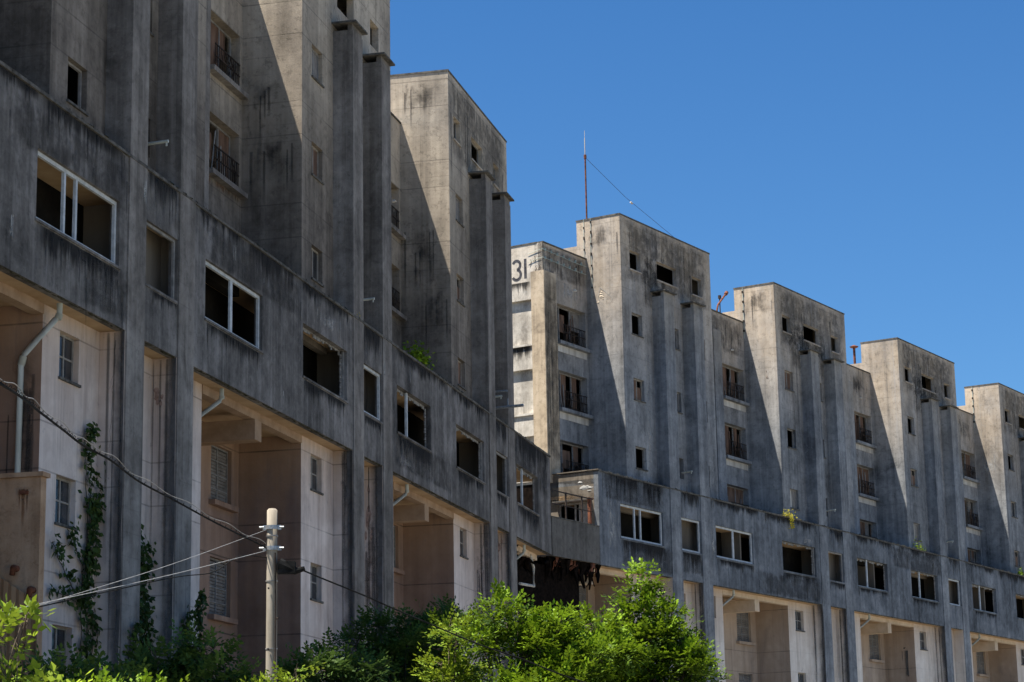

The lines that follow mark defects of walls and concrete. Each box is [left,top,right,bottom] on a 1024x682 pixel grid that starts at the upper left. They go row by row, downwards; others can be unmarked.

leakage [49,101,119,154]
leakage [144,172,175,202]
leakage [43,227,114,281]
leakage [202,210,347,324]
leakage [513,346,530,356]
leakage [399,350,484,415]
leakage [496,419,547,464]
leakage [110,331,125,678]
leakage [160,358,176,664]
leakage [714,500,813,529]
leakage [624,540,664,559]
leakage [713,541,753,570]